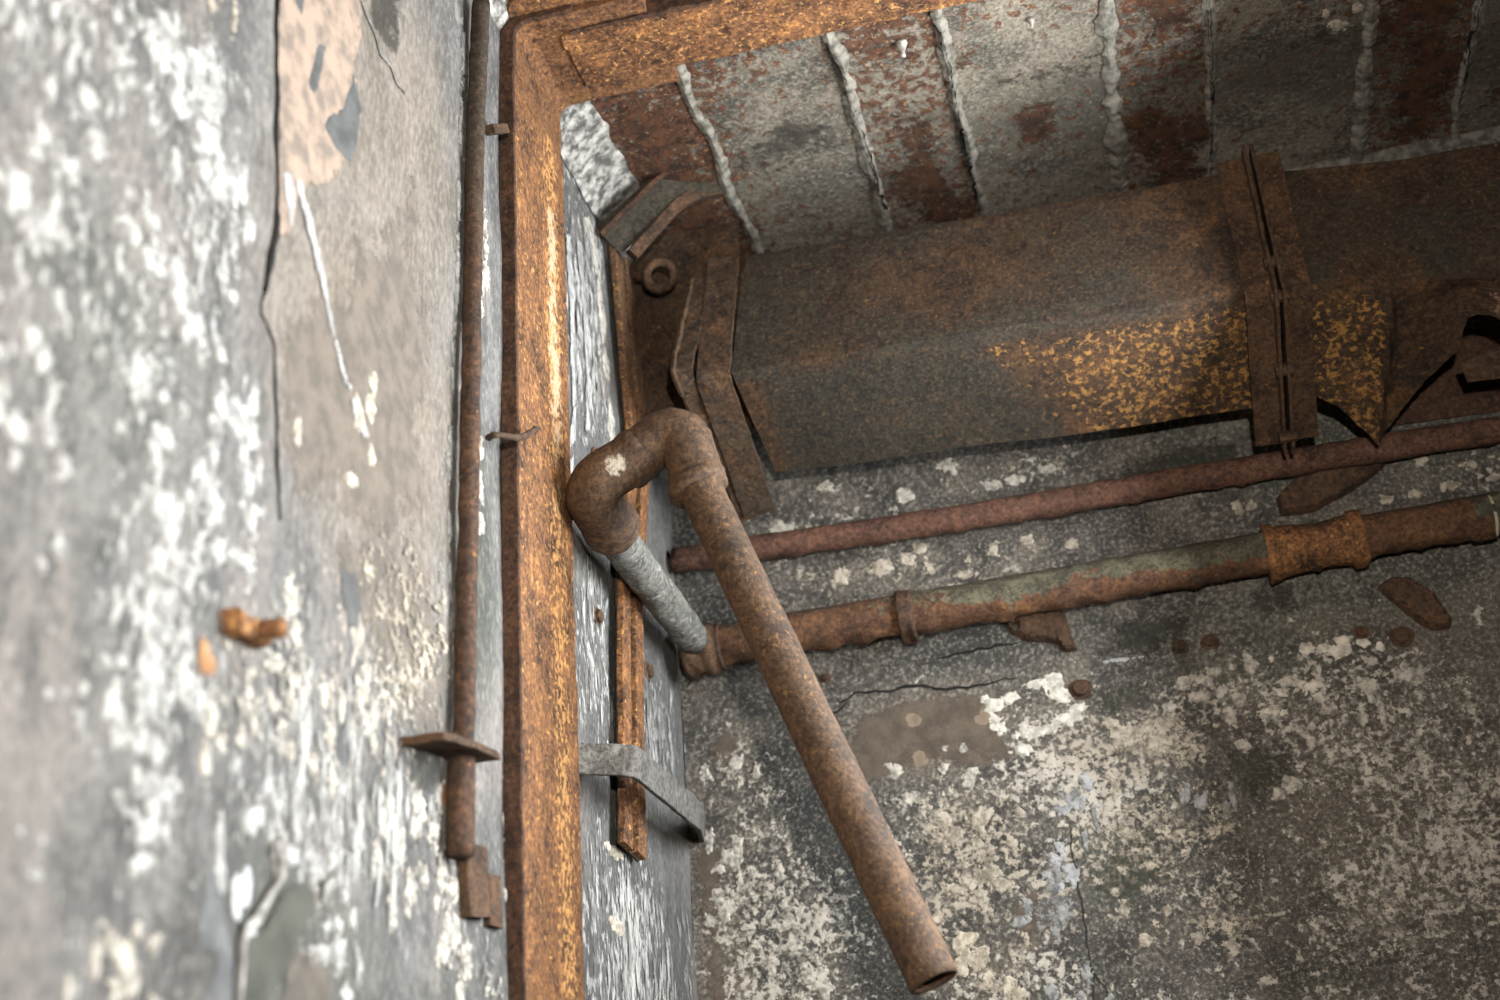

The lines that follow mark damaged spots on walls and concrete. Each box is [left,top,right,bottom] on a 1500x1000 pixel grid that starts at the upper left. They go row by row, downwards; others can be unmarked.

peeling [0,73,109,301]
rust [597,93,709,186]
rust [883,113,977,227]
rust [1013,100,1060,145]
rust [1123,103,1211,188]
peeling [0,286,73,487]
peeling [35,525,70,574]
peeling [44,0,504,1000]
damp [603,841,624,862]
damp [684,732,851,1000]
damp [878,635,1500,1000]
damp [607,915,625,937]